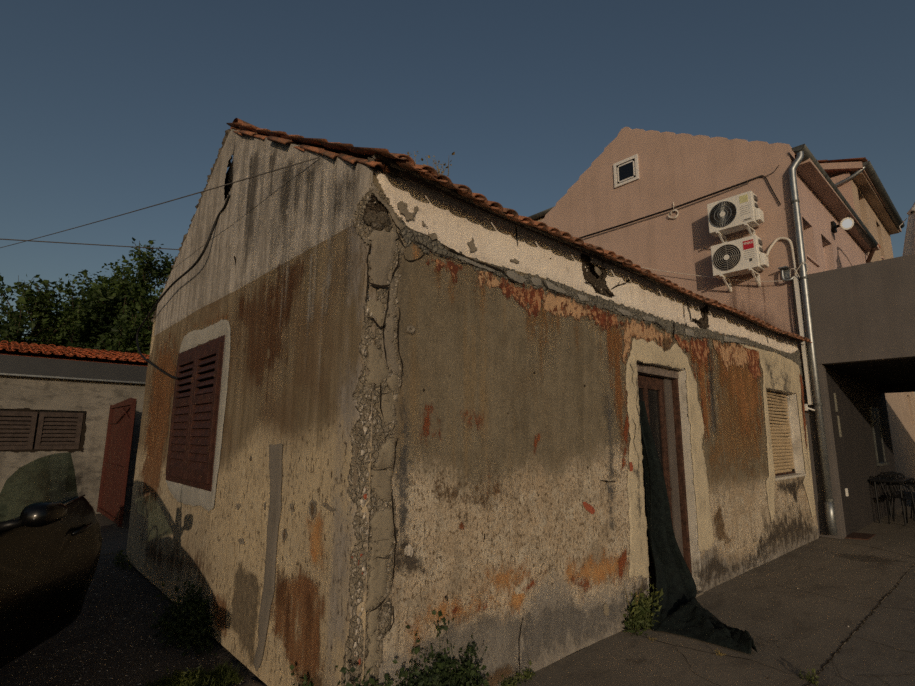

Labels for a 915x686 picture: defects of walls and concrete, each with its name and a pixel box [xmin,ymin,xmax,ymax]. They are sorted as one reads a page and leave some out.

damp [231,154,321,248]
flaking render [341,182,803,686]
rust [689,342,763,438]
rust [566,550,629,591]
rust [714,505,731,543]
damp [697,477,818,593]
rust [271,569,325,685]